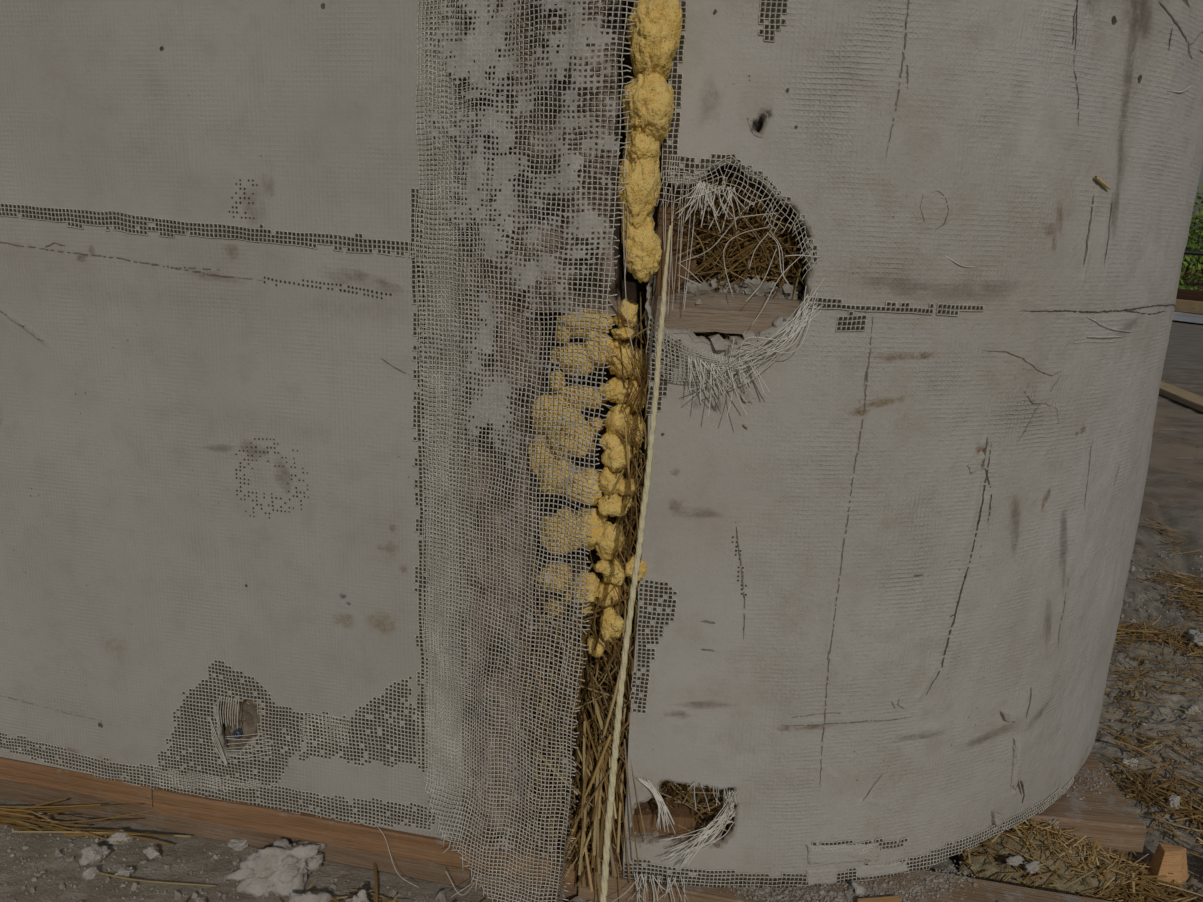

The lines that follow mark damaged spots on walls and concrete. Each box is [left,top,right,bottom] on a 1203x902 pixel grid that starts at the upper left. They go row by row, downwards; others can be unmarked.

spalling [455,0,465,41]
peeling [758,0,789,42]
spalling [643,144,818,486]
crack [1023,304,1176,315]
spalling [455,66,470,840]
peeling [151,659,421,792]
peeling [626,579,677,765]
spalling [621,779,740,868]